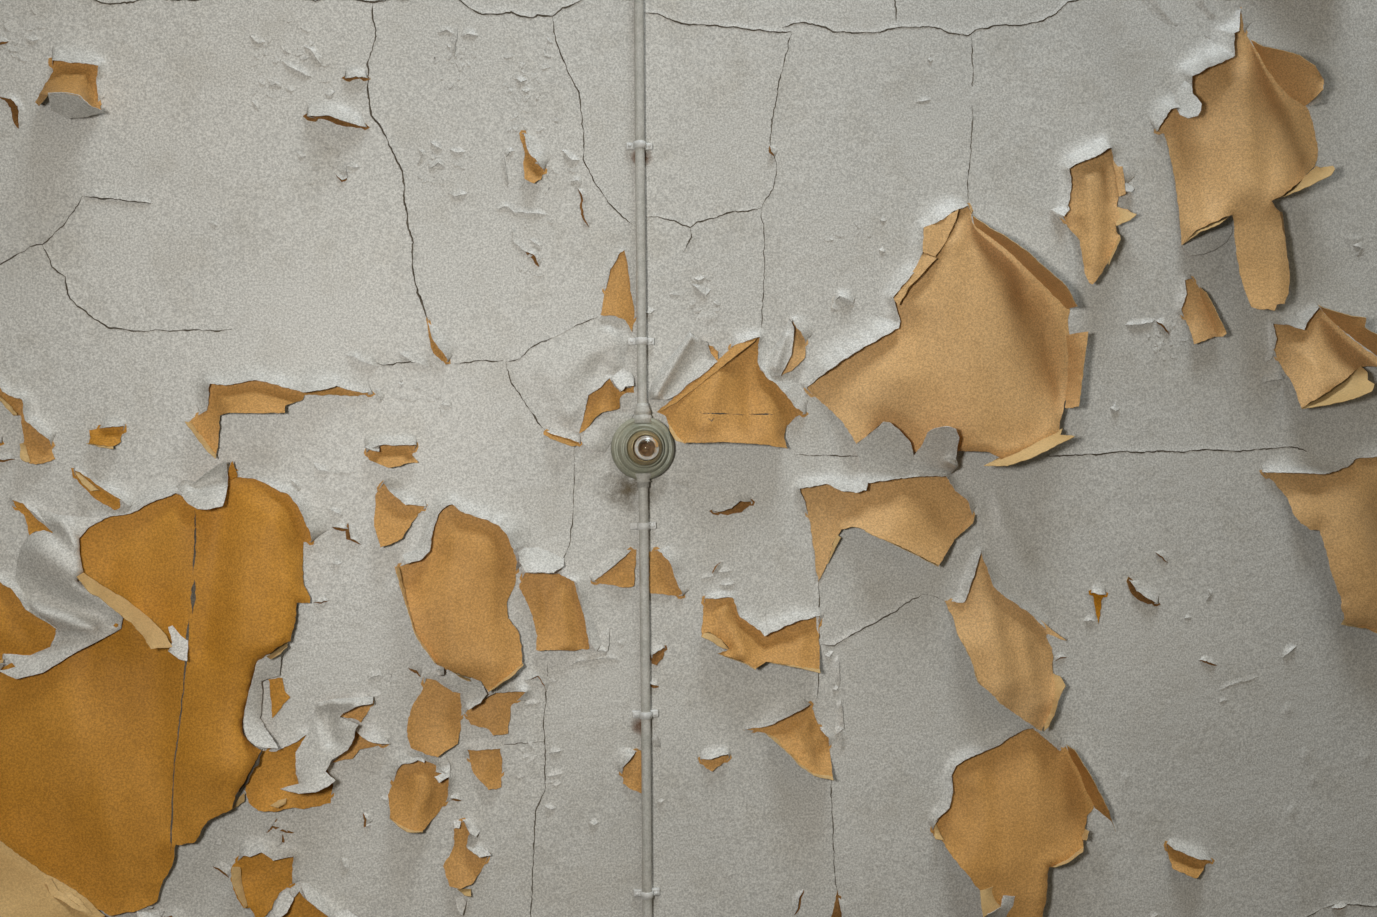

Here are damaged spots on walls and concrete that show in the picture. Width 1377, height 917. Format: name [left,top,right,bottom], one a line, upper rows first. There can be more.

peeling [0,39,112,137]
crack [0,181,232,332]
crack [170,515,196,851]
crack [357,0,435,321]
peeling [0,348,848,917]
crack [376,312,598,430]
crack [459,0,1079,328]
peeling [543,188,1116,917]
peeling [1049,126,1138,285]
crack [1045,439,1344,457]
peeling [1126,7,1377,409]
peeling [1259,439,1377,633]